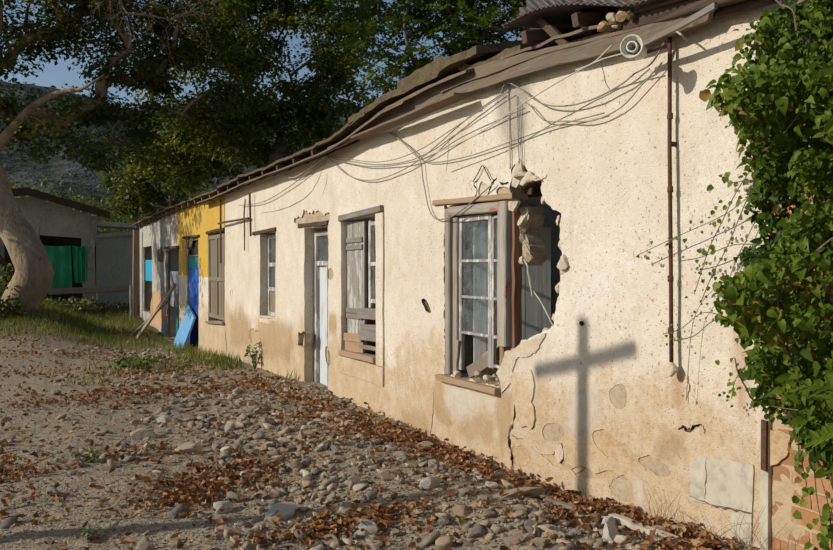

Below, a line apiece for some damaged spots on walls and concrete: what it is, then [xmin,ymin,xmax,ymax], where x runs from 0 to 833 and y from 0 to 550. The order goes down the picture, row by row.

spalling [609,384,627,409]
spalling [541,423,629,480]
spalling [592,429,670,476]
crack [678,424,706,432]